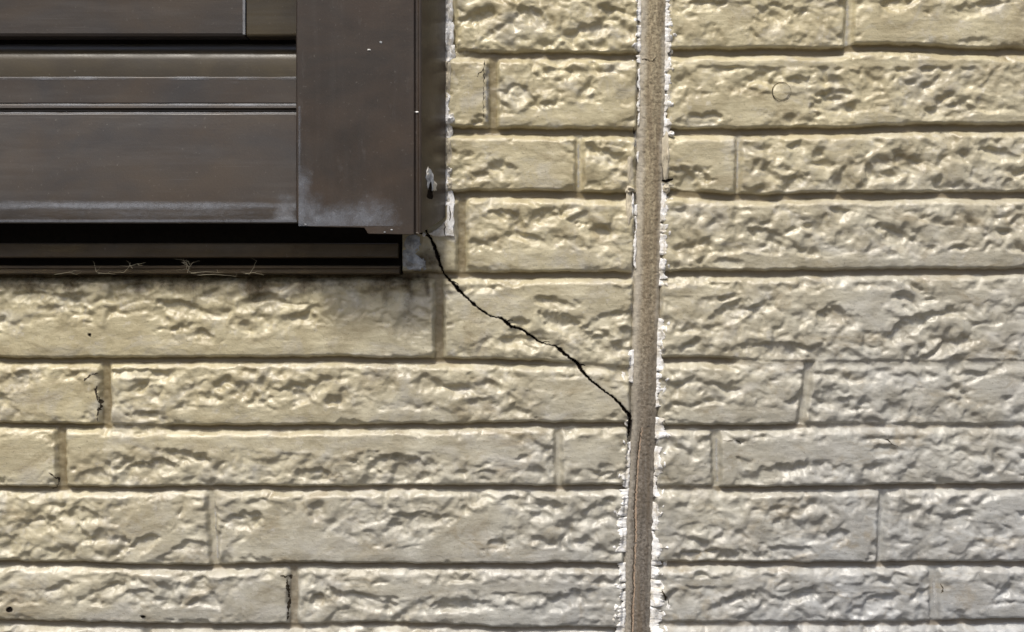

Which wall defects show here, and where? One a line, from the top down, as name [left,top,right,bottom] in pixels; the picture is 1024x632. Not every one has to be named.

crack [84,373,104,420]
crack [420,206,665,632]
crack [280,574,293,619]